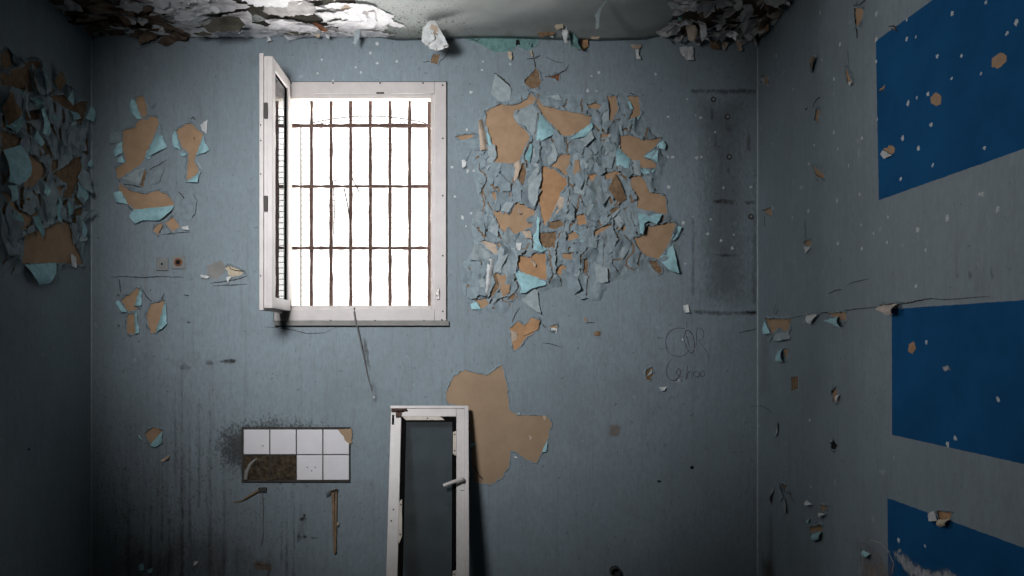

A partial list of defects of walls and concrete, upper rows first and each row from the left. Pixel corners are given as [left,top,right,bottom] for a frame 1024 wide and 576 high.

peeling [48,0,407,46]
peeling [656,0,790,60]
peeling [0,46,97,285]
peeling [110,94,210,237]
peeling [454,0,683,352]
peeling [115,286,168,337]
peeling [201,260,247,286]
peeling [762,305,848,363]
crack [794,279,876,318]
peeling [876,300,903,315]
crack [902,296,987,304]
flaking render [445,364,553,486]